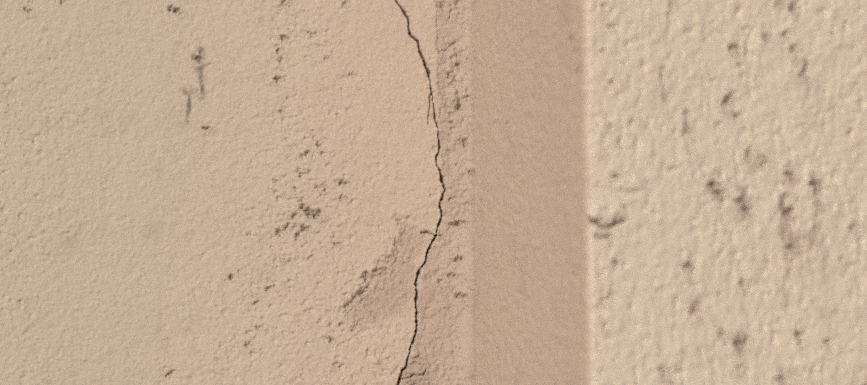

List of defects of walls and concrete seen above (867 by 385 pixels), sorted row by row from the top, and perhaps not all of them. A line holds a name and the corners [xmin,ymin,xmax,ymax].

crack [395,0,446,385]